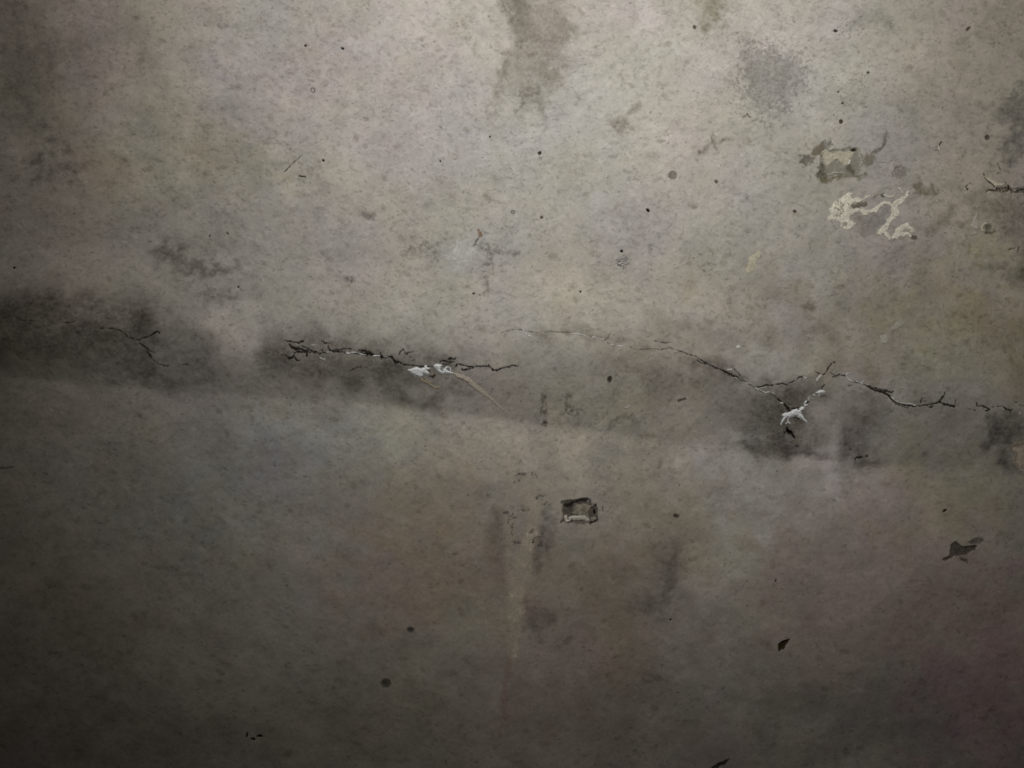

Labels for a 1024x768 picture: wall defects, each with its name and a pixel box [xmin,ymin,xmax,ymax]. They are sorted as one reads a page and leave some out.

peeling [800,141,917,240]
crack [110,327,187,366]
crack [282,340,517,378]
damp [408,364,503,410]
damp [780,374,825,425]
crack [661,342,1021,414]
spalling [561,498,597,524]
spalling [943,541,977,561]